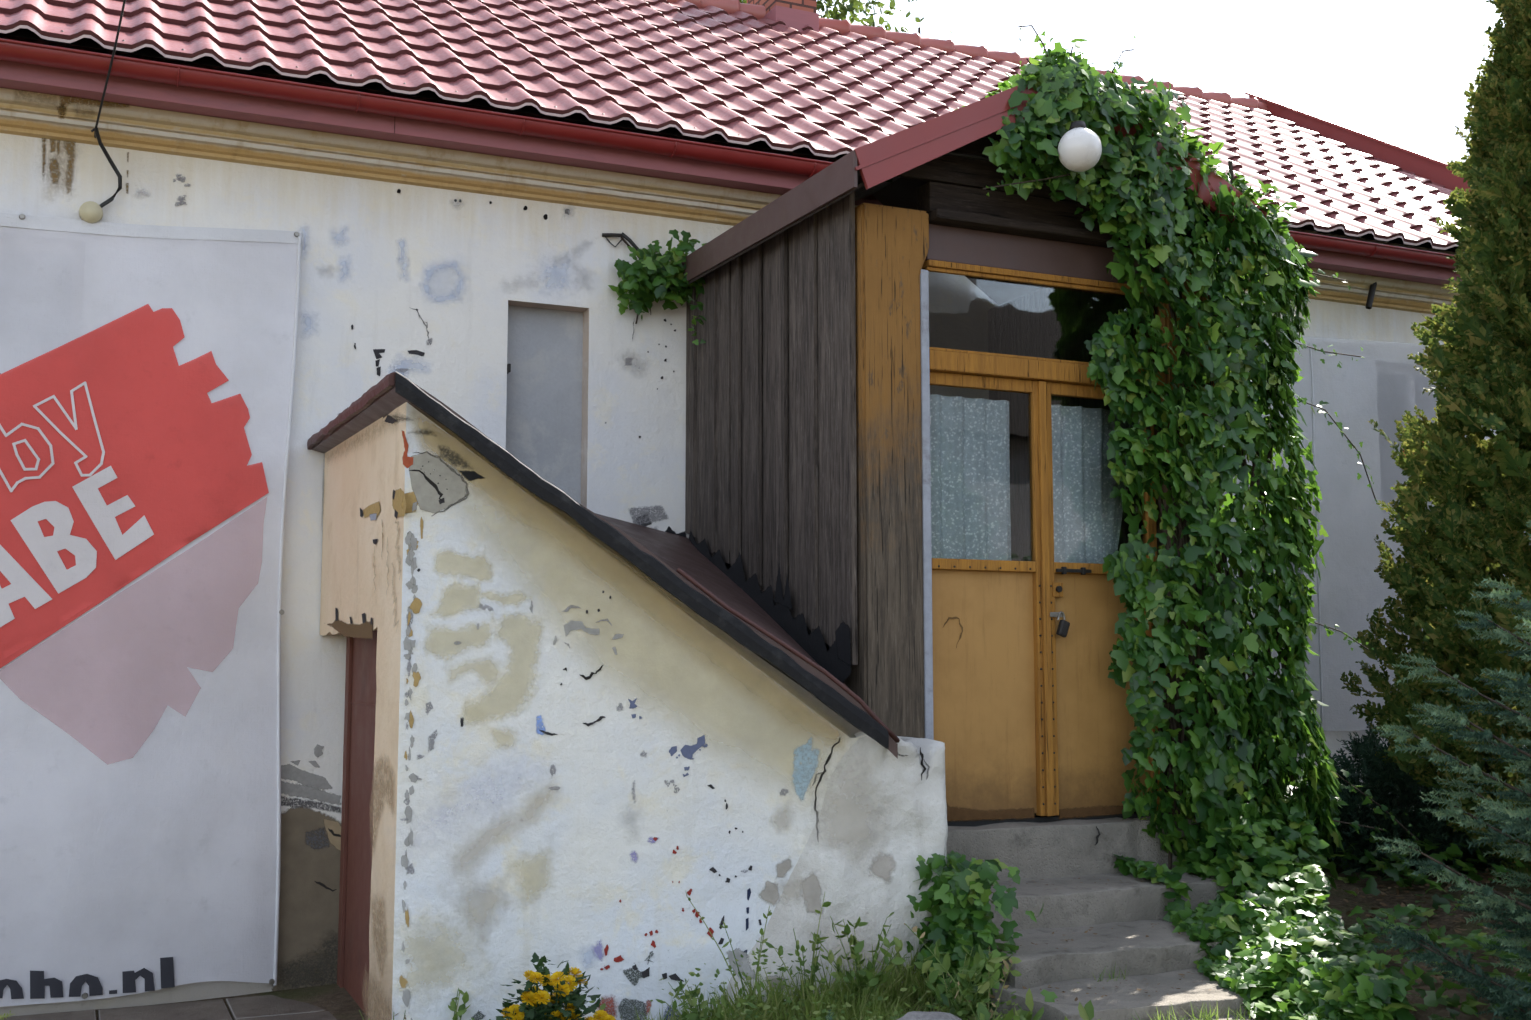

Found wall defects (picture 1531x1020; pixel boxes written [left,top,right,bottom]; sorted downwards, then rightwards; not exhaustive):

water stain [57,96,129,118]
water stain [42,138,75,192]
peeling [360,431,624,927]
peeling [664,735,708,793]
crack [812,738,840,839]
flaking render [272,744,341,991]
peeling [672,881,714,937]
flaking render [399,944,412,1020]